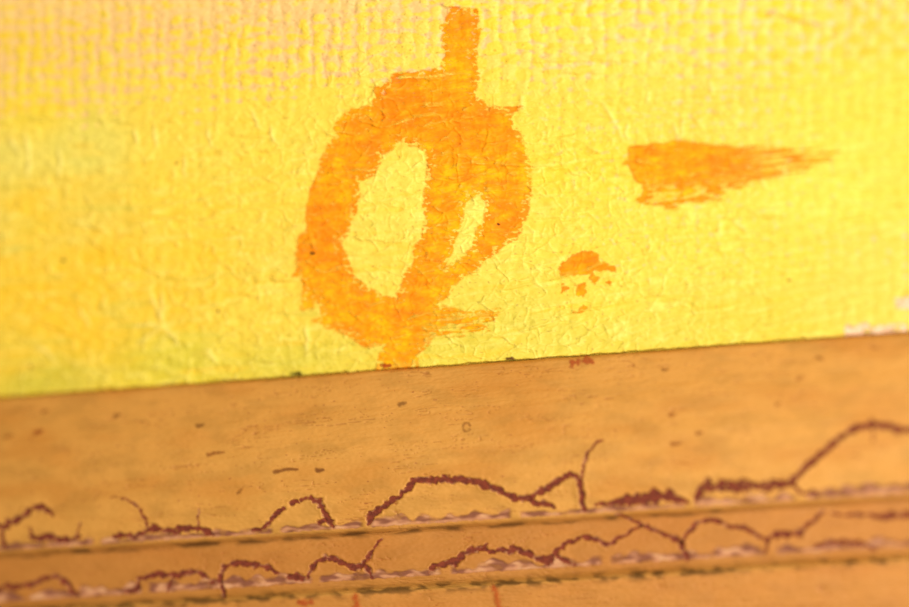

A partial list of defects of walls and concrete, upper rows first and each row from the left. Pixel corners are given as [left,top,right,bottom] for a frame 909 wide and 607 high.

peeling [894,297,909,309]
peeling [845,322,908,337]
crack [113,418,909,598]
crack [0,504,81,548]
crack [0,574,79,598]